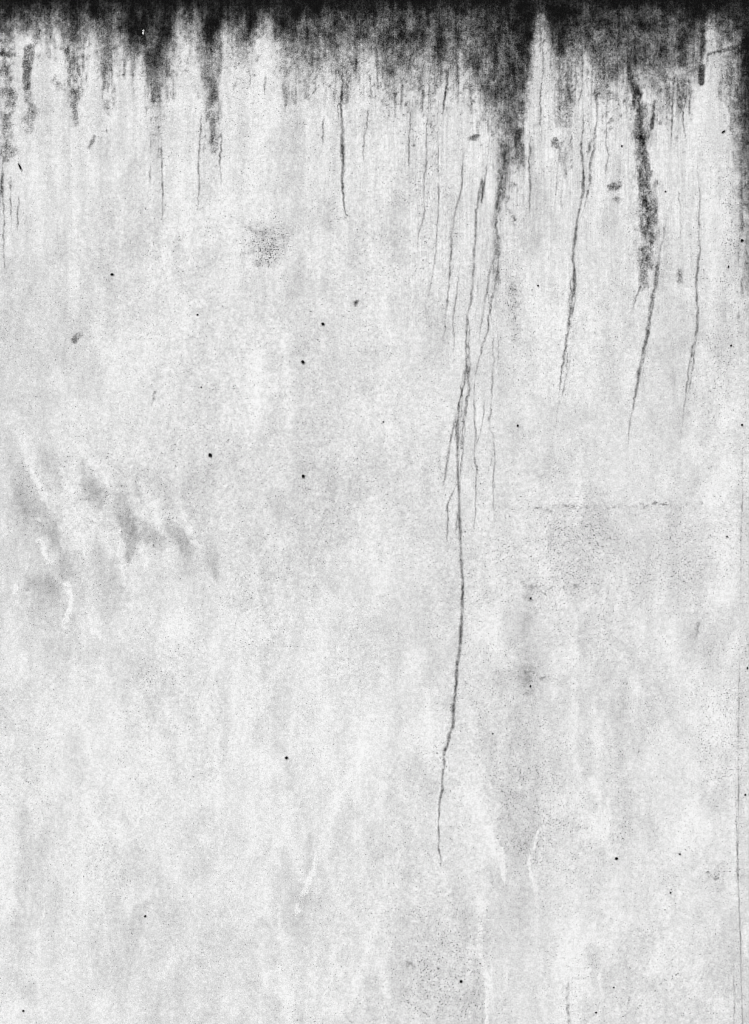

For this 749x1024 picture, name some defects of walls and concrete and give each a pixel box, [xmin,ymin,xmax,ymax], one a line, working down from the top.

leakage [0,0,749,284]